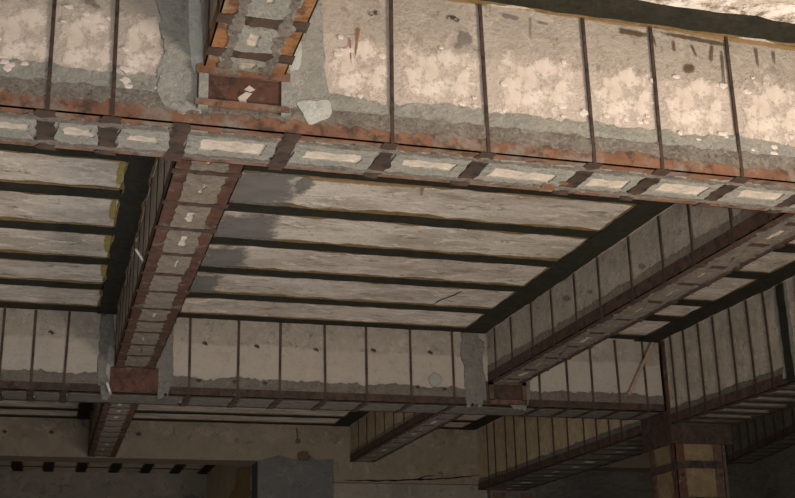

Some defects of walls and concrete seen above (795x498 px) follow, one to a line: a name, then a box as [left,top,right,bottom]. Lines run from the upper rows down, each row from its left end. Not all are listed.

leakage [455,31,472,49]
rust [518,8,657,47]
rust [665,29,795,84]
leakage [189,171,315,293]